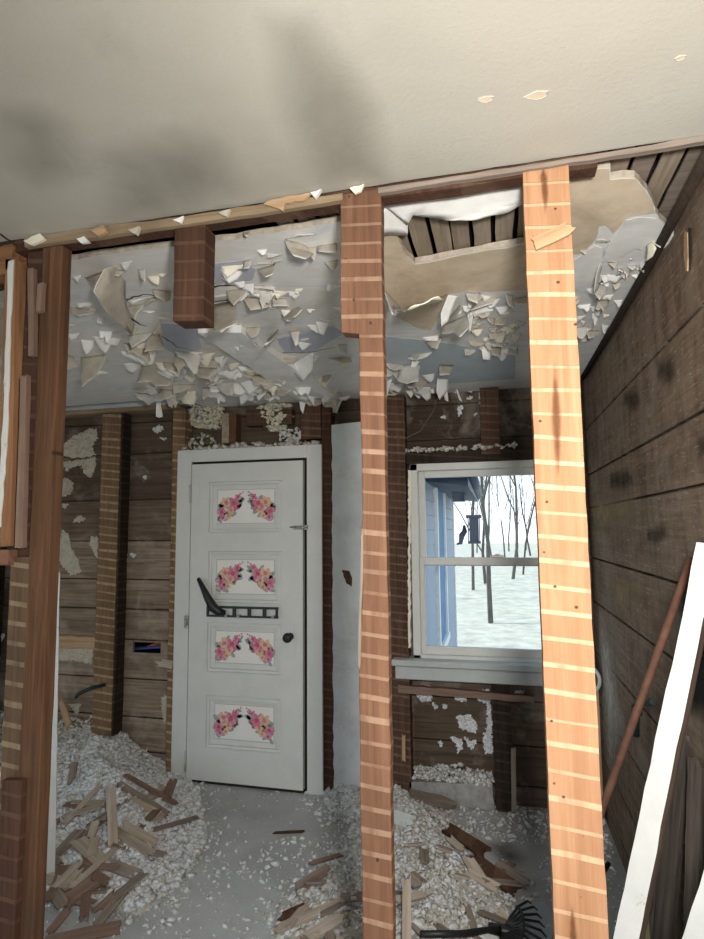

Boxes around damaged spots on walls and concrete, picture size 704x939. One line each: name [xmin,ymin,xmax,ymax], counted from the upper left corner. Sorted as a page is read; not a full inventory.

peeling [24,233,47,246]
peeling [569,140,704,343]
peeling [67,189,355,441]
peeling [384,187,527,416]
peeling [61,428,99,509]
peeling [59,515,86,576]
peeling [89,536,99,558]